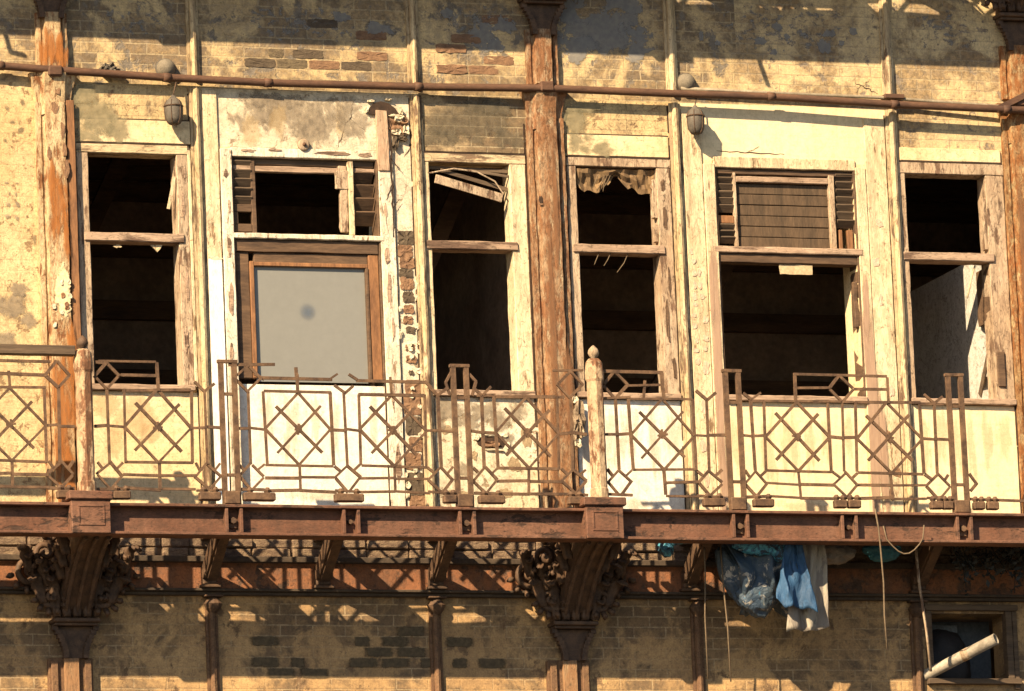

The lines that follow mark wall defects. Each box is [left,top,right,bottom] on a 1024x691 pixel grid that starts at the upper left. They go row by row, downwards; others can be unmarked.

peeling [436,14,517,75]
peeling [47,88,70,179]
flaking render [52,262,72,328]
flaking render [384,231,425,506]